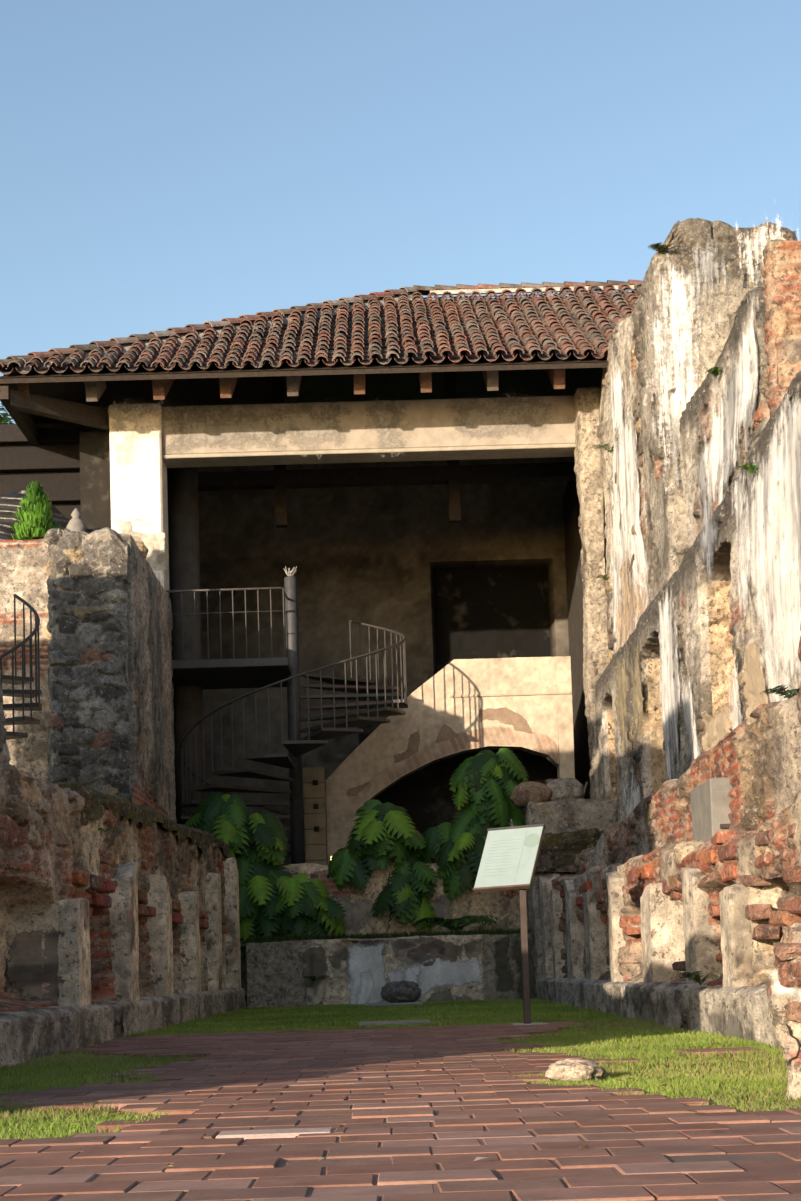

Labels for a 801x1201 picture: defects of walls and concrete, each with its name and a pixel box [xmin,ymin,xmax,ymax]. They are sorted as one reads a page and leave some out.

water stain [609,360,700,780]
water stain [650,242,726,486]
water stain [729,665,742,730]
water stain [697,300,801,702]